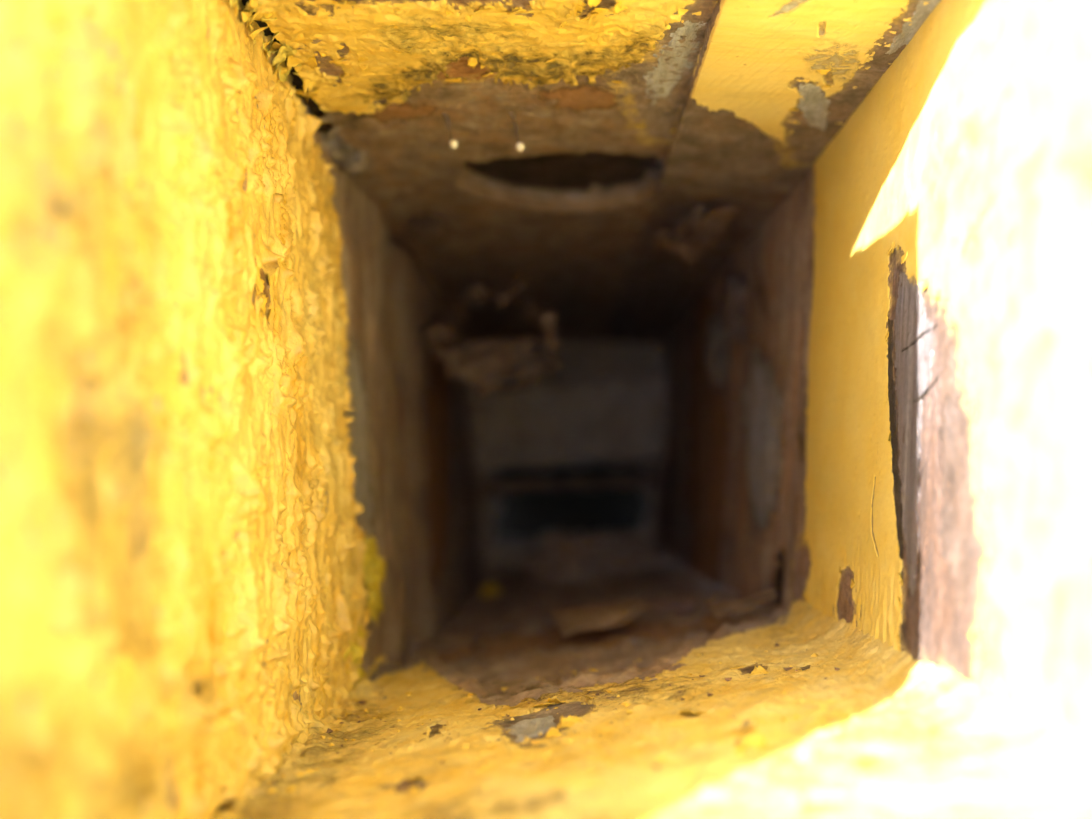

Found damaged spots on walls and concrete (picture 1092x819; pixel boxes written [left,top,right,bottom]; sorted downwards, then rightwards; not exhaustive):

peeling [287,0,536,23]
peeling [572,0,628,20]
crack [229,0,354,162]
peeling [809,68,845,92]
peeling [885,241,994,687]
peeling [833,565,862,627]